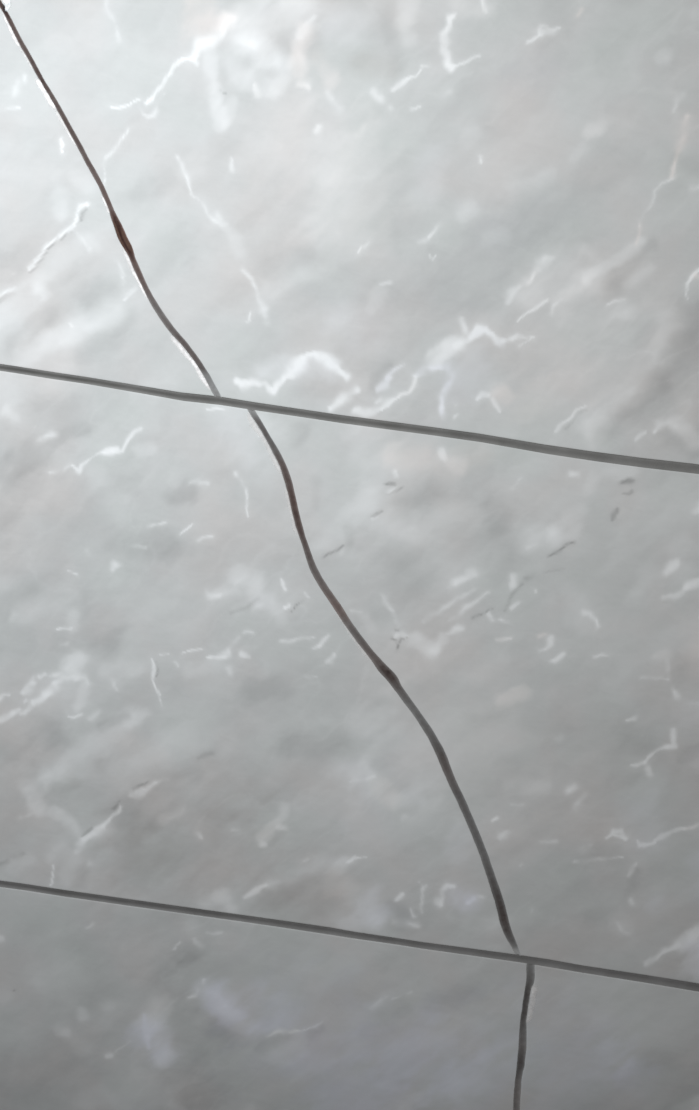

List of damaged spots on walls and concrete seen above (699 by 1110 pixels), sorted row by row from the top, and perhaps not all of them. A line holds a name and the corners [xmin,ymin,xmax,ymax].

crack [0,0,222,398]
crack [248,410,537,1110]